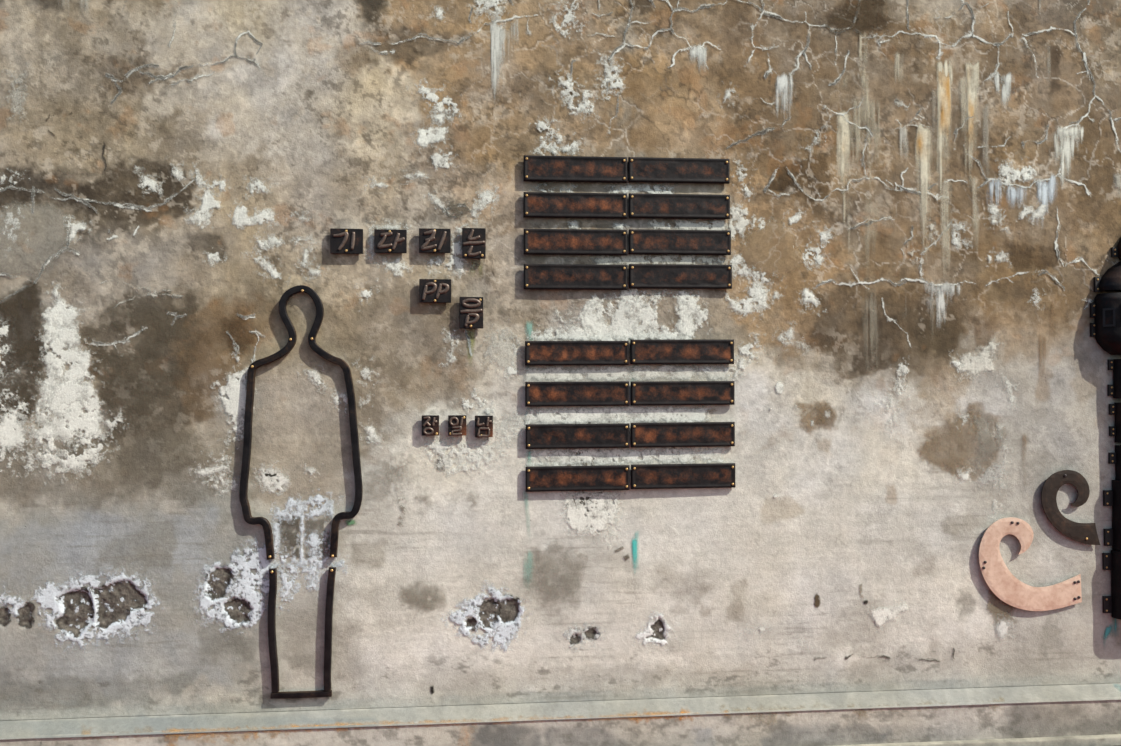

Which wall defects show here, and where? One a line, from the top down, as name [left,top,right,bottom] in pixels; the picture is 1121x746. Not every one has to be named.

crack [364,0,536,55]
efflorescence [776,75,792,109]
crack [570,0,1121,346]
leakage [837,70,869,176]
corrosion [900,60,952,244]
corrosion [966,63,979,158]
efflorescence [1038,127,1084,205]
crack [0,177,197,303]
peeling [0,284,122,473]
spalling [195,465,345,632]
spalling [0,572,160,650]
spalling [444,586,524,651]